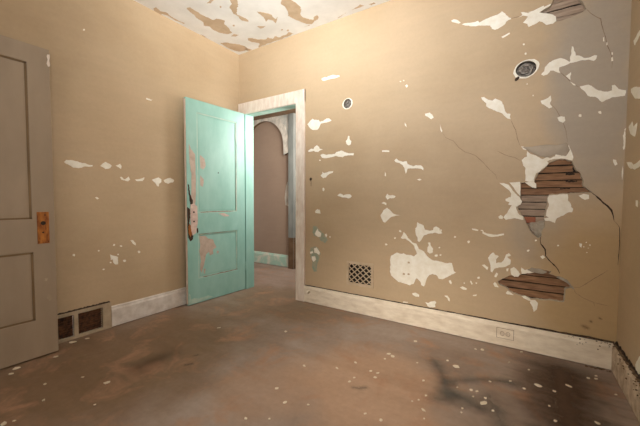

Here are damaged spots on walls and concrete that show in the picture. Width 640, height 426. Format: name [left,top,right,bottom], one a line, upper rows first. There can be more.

peeling [187,7,293,52]
peeling [281,0,319,26]
peeling [451,12,511,30]
spalling [520,0,586,27]
peeling [541,46,640,102]
peeling [307,118,331,130]
peeling [481,97,510,119]
peeling [308,136,354,161]
spalling [499,145,592,241]
peeling [390,222,456,286]
crack [574,192,620,306]
spalling [482,253,574,311]